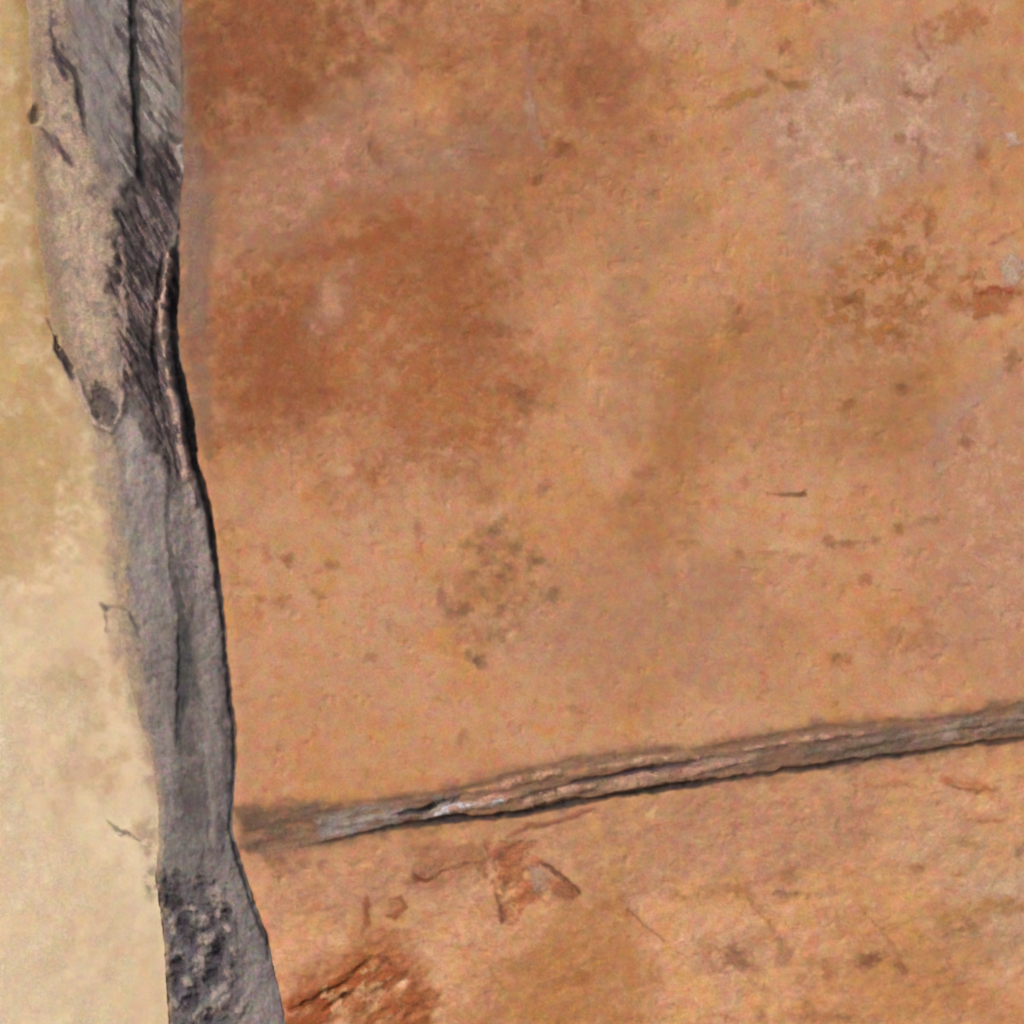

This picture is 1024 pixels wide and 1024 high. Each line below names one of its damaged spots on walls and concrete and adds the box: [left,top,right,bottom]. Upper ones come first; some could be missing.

crack [129,0,144,188]
crack [152,252,236,767]
crack [233,843,267,939]
peeling [283,898,439,1024]
spalling [236,702,1024,919]
crack [357,725,1024,835]